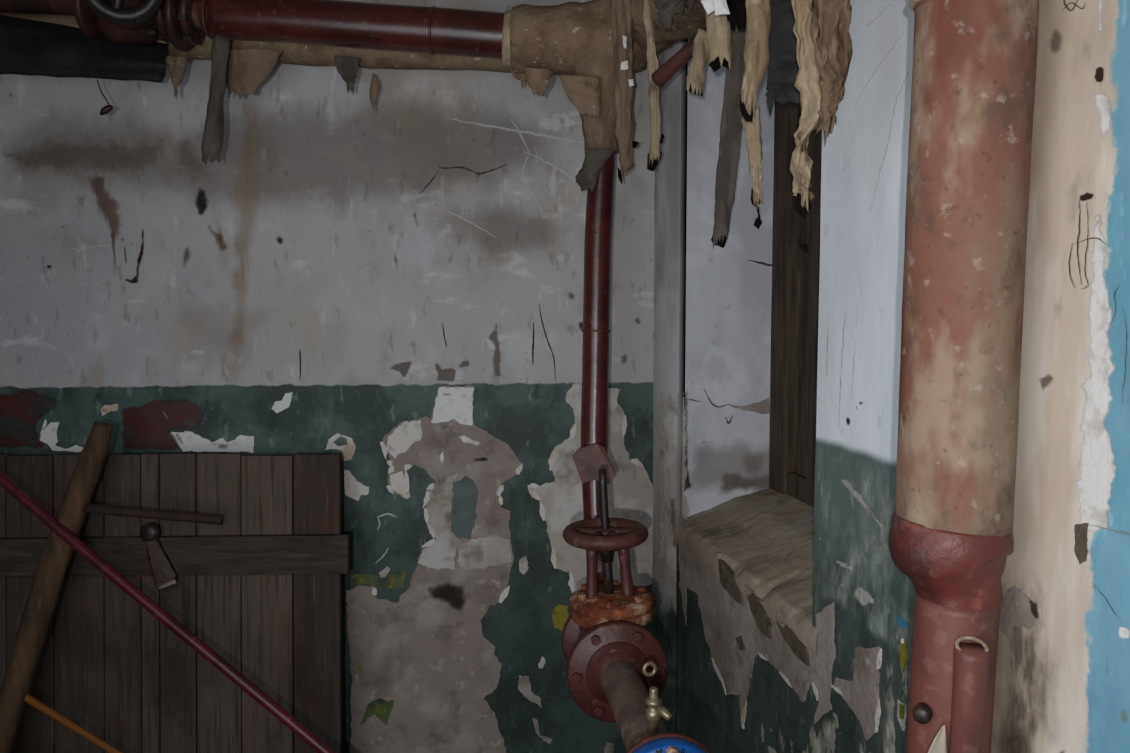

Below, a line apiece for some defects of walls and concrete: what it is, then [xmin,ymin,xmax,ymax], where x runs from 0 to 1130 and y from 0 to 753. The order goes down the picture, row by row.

flaking render [701,0,730,16]
corrosion [93,179,126,260]
peeling [0,390,83,452]
peeling [101,400,254,453]
peeling [272,392,293,413]
flaking render [1074,215,1116,564]
peeling [325,433,369,501]
flaking render [528,384,587,593]
flaking render [346,361,529,753]
flaking render [607,388,909,753]
water stain [1014,625,1034,683]
water stain [1001,695,1035,753]